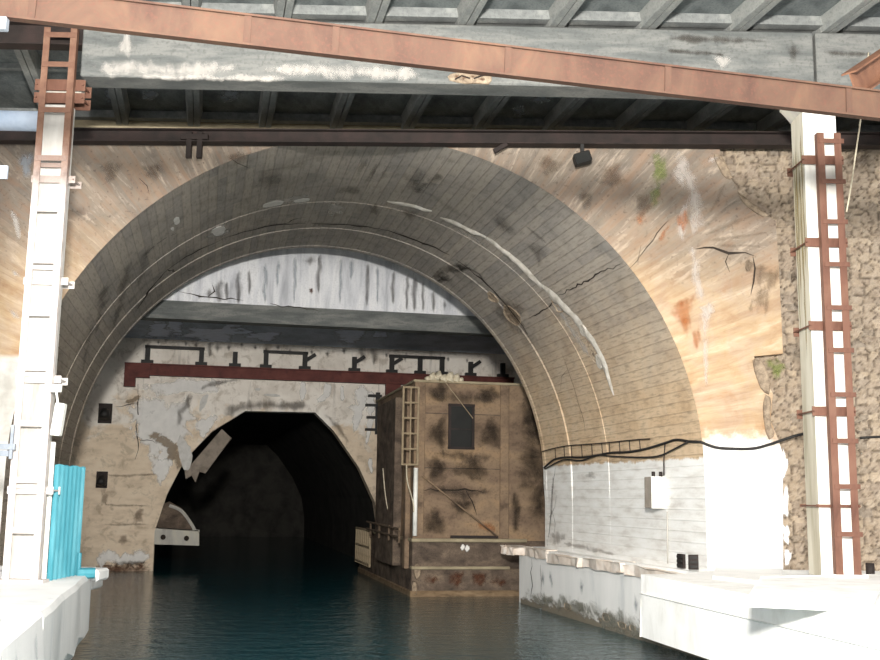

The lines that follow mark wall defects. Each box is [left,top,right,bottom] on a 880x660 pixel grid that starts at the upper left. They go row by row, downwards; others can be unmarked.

crack [135,217,667,333]
leakage [387,201,614,395]
crack [697,247,756,293]
peeling [128,379,221,485]
leakage [524,409,536,436]
spalling [752,358,781,440]
leakage [526,449,544,511]
leakage [521,596,709,660]